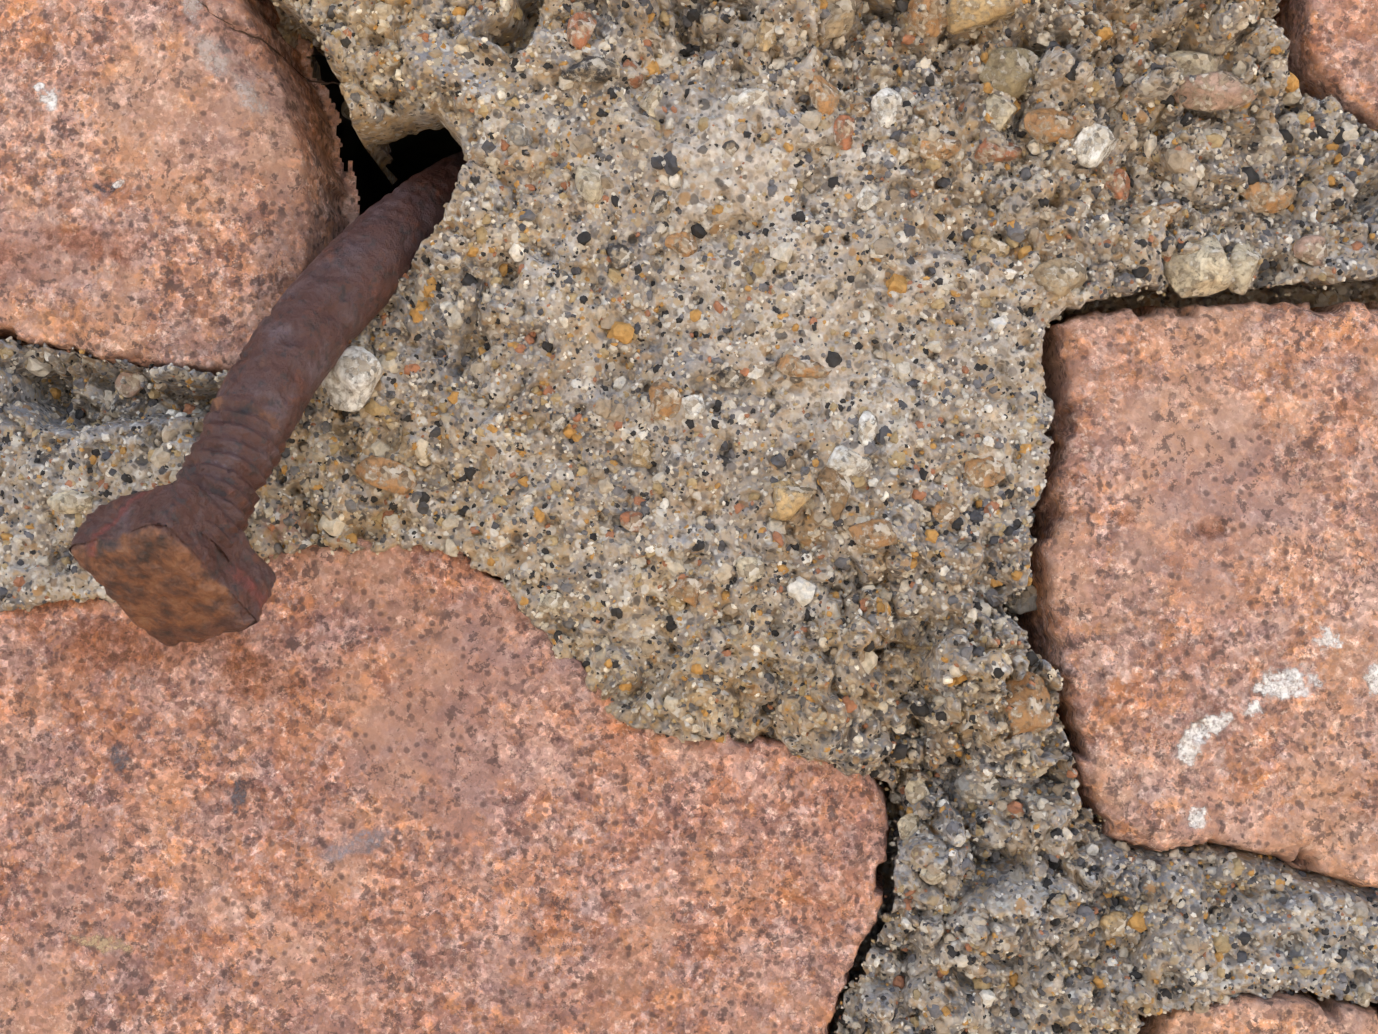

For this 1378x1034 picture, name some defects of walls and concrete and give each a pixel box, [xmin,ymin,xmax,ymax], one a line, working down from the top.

damp [1314,628,1342,648]
damp [1364,664,1378,694]
damp [1177,668,1321,766]
damp [1188,807,1206,829]